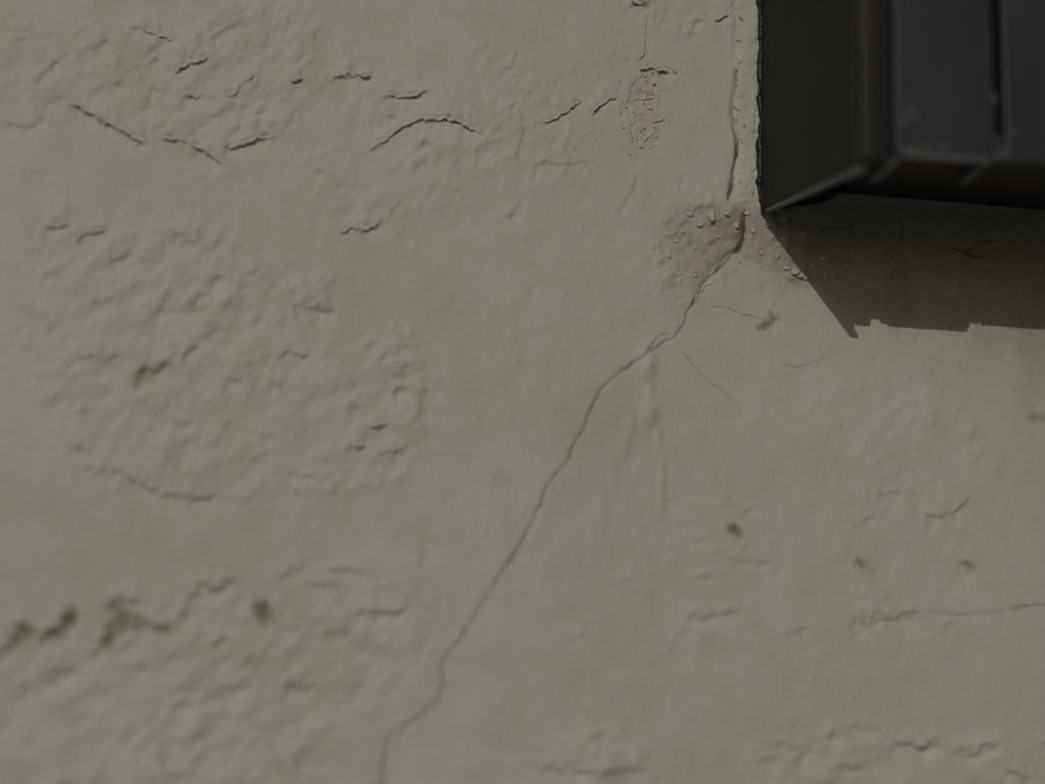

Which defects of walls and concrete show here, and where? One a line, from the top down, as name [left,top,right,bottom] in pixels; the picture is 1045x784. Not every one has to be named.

peeling [0,0,320,166]
spalling [617,58,678,159]
crack [715,143,745,272]
spalling [650,184,844,326]